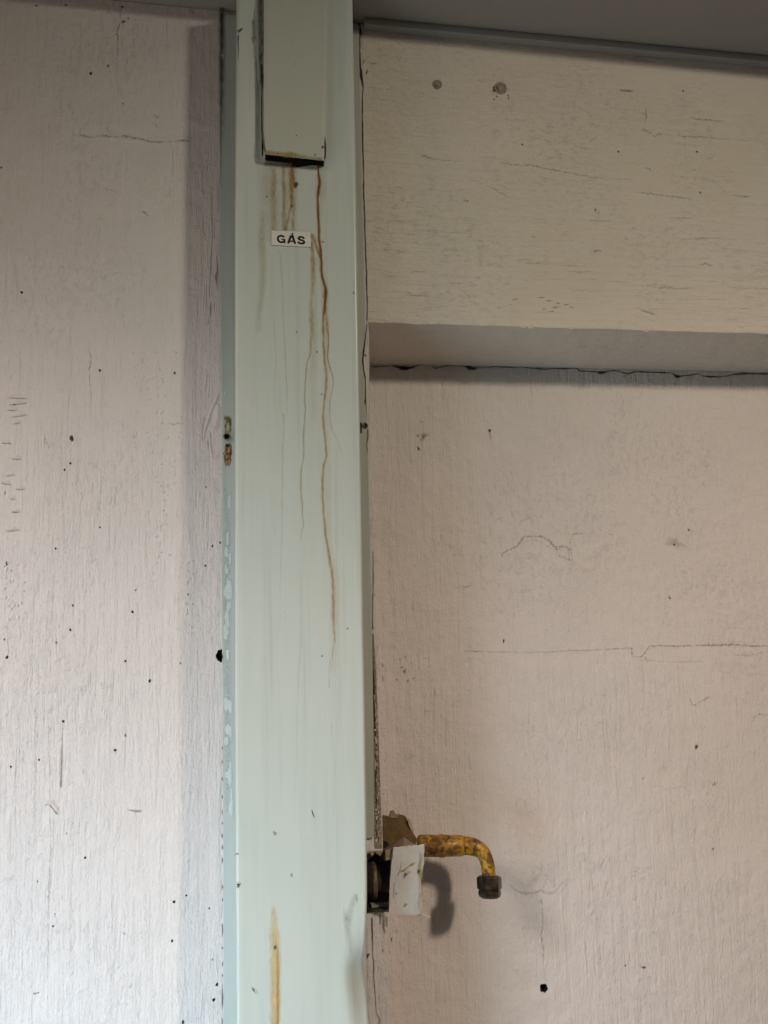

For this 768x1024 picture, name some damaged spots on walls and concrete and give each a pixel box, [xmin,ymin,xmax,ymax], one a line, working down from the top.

corrosion [268,151,302,191]
corrosion [311,167,327,331]
crack [372,365,767,380]
corrosion [223,416,232,466]
corrosion [271,927,279,1024]